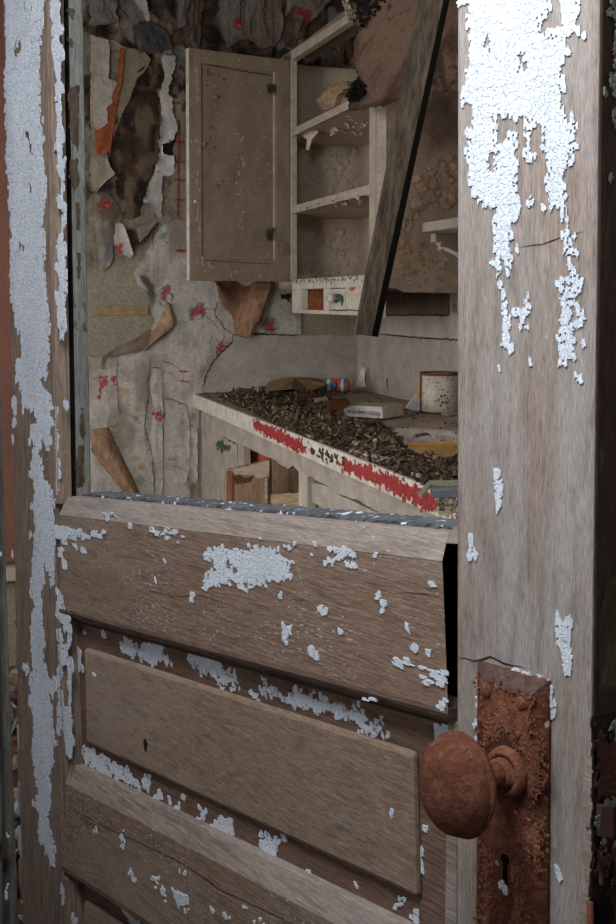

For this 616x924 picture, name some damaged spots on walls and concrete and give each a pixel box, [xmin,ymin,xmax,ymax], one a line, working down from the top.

peeling [603,0,616,130]
peeling [456,0,587,384]
peeling [3,0,186,867]
crack [134,355,189,495]
peeling [189,537,297,603]
peeling [310,541,358,569]
peeling [186,653,391,740]
peeling [391,621,449,711]
peeling [196,804,235,836]
peeling [258,830,288,857]
peeling [151,876,189,914]
peeling [393,895,420,924]